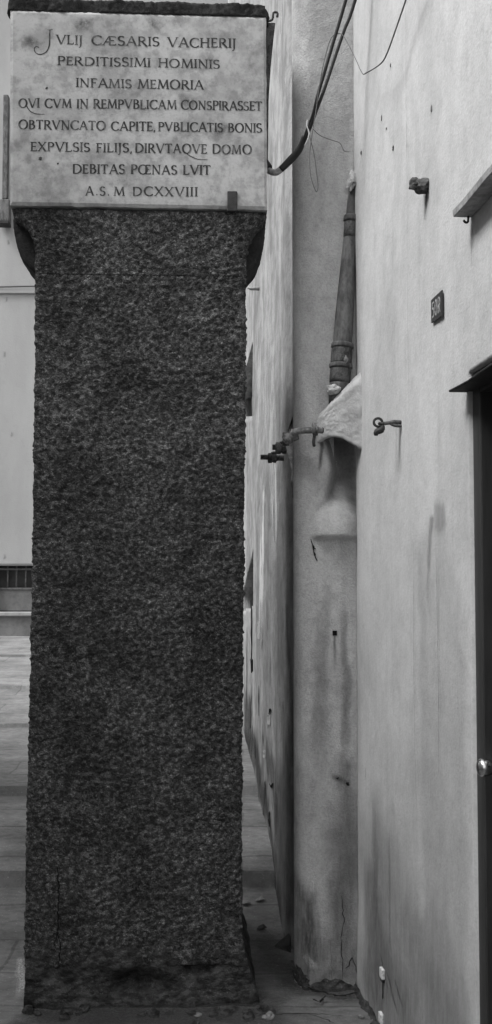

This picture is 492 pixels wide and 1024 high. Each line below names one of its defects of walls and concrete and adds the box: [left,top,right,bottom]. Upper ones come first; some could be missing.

crack [241,896,357,1023]